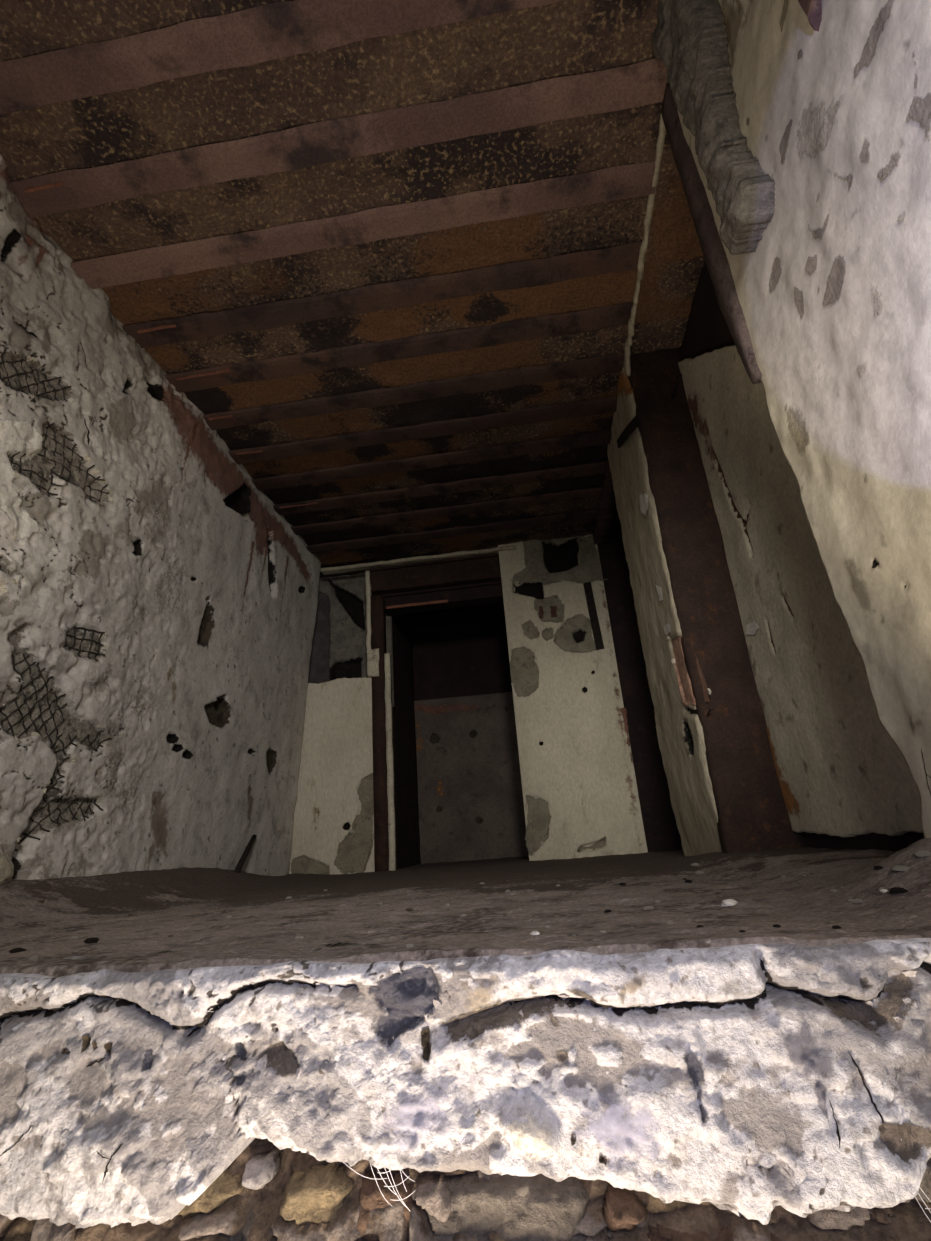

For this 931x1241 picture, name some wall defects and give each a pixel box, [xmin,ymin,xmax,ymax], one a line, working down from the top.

spalling [0,349,72,401]
spalling [0,419,113,541]
rust [162,369,319,614]
spalling [510,535,608,697]
spalling [0,623,112,858]
crack [0,980,356,1037]
spalling [368,967,607,1047]
crack [478,959,884,1016]
crack [920,962,931,974]
spalling [235,1043,303,1085]
crack [829,1100,841,1148]
crack [848,1052,884,1124]